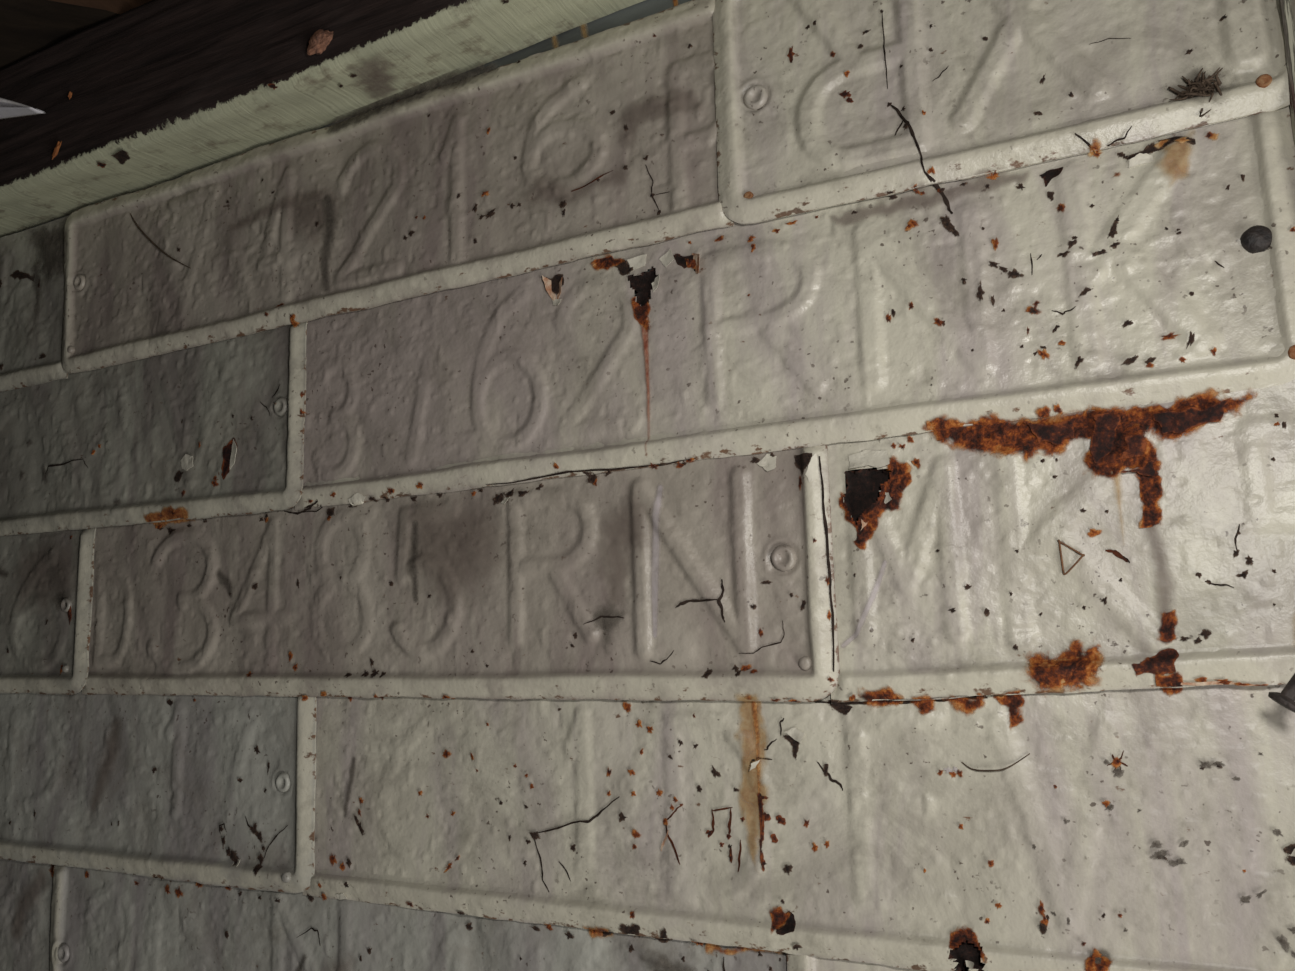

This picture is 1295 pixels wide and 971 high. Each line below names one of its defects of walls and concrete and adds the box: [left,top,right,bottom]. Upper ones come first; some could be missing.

peeling [542,274,564,306]
corrosion [631,296,651,421]
corrosion [839,388,1253,549]
peeling [1195,524,1254,588]
corrosion [1026,640,1104,692]
peeling [1180,629,1211,644]
corrosion [1132,609,1268,696]
corrosion [706,687,1025,872]
corrosion [949,927,987,963]
corrosion [1082,941,1112,971]